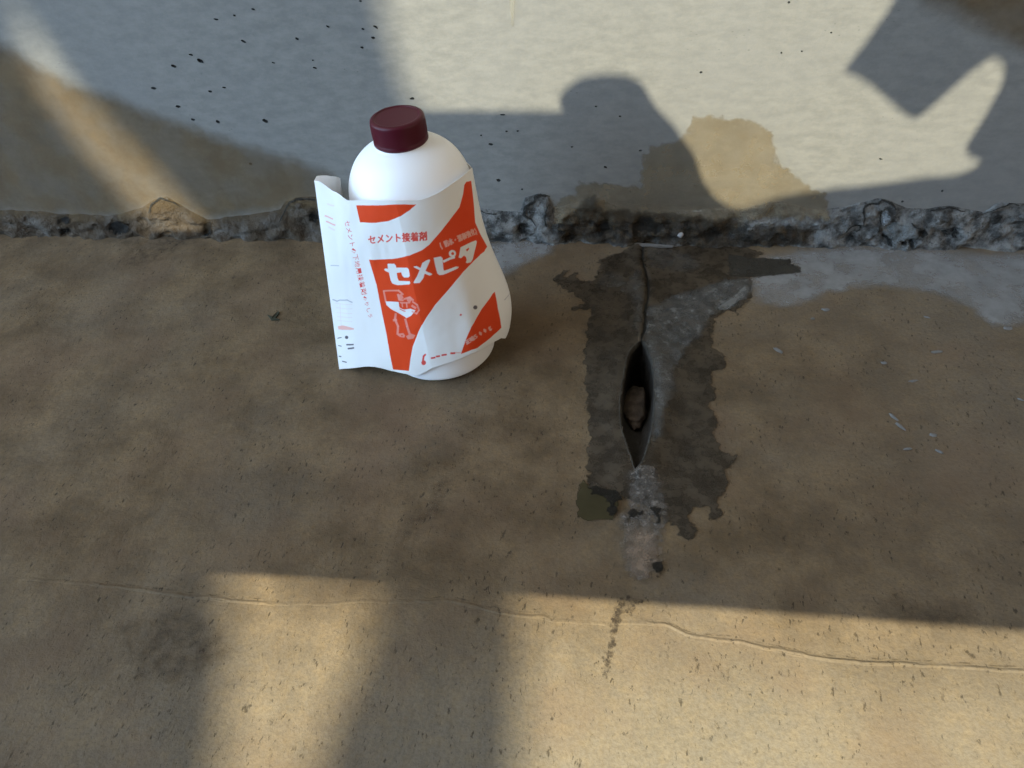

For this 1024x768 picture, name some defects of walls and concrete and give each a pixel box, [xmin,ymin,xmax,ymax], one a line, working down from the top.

peeling [881,210,917,251]
crack [619,247,656,469]
leakage [553,116,829,579]
crack [0,575,1024,673]